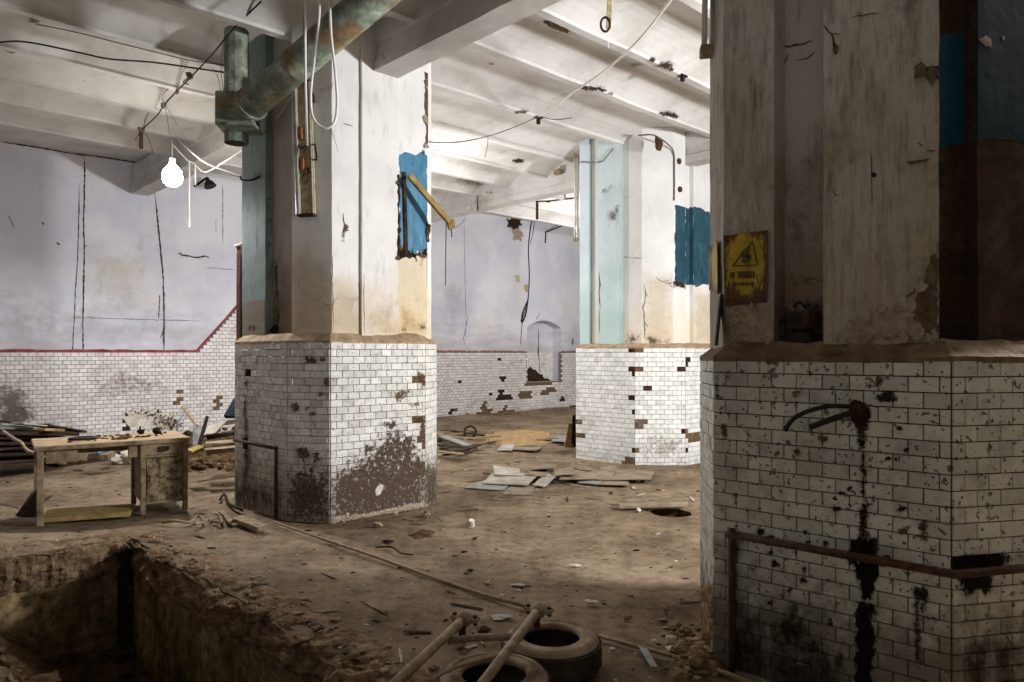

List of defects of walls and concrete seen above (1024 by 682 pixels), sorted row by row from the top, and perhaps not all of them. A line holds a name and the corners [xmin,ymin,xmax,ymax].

crack [784,9,891,63]
peeling [396,72,431,334]
flaking render [906,243,940,345]
spalling [448,367,585,438]
peeling [628,386,652,429]
peeling [621,448,639,465]
peeling [681,428,700,453]
corrosion [898,519,936,552]
leakage [954,552,1012,597]
corrosion [911,586,929,669]